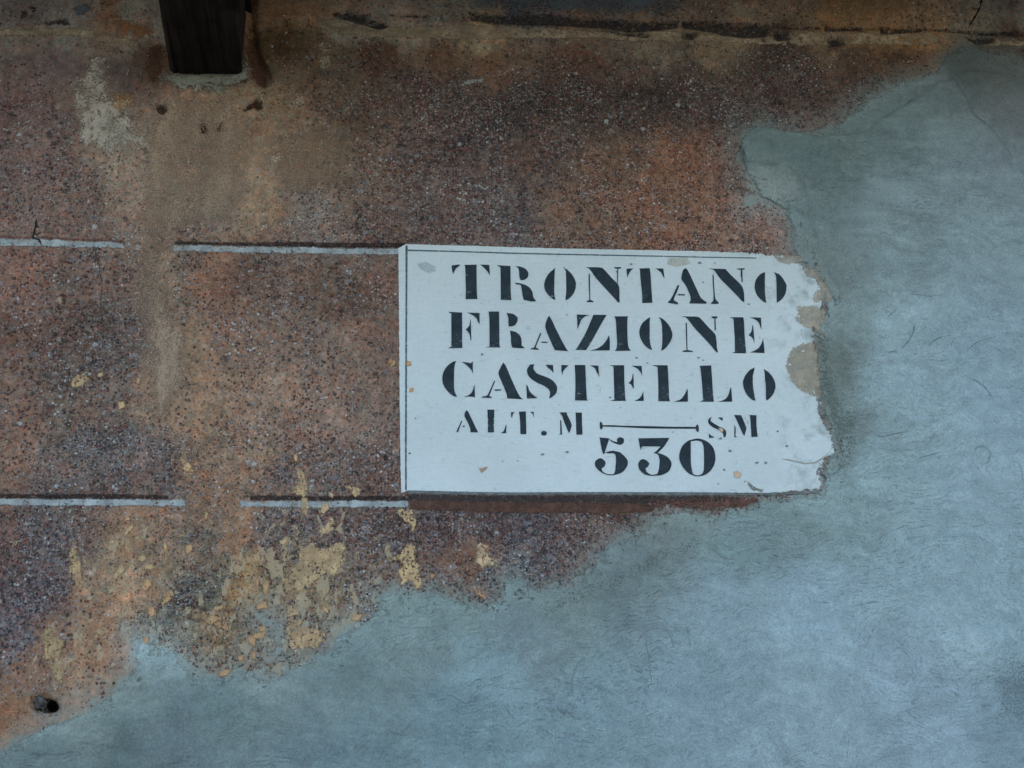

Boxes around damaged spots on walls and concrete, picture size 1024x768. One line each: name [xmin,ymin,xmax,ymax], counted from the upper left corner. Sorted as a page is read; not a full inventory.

flaking render [775,254,834,398]
peeling [138,541,167,591]
peeling [256,454,346,650]
peeling [393,508,435,588]
peeling [476,543,497,567]
peeling [148,590,173,617]
peeling [219,626,265,676]